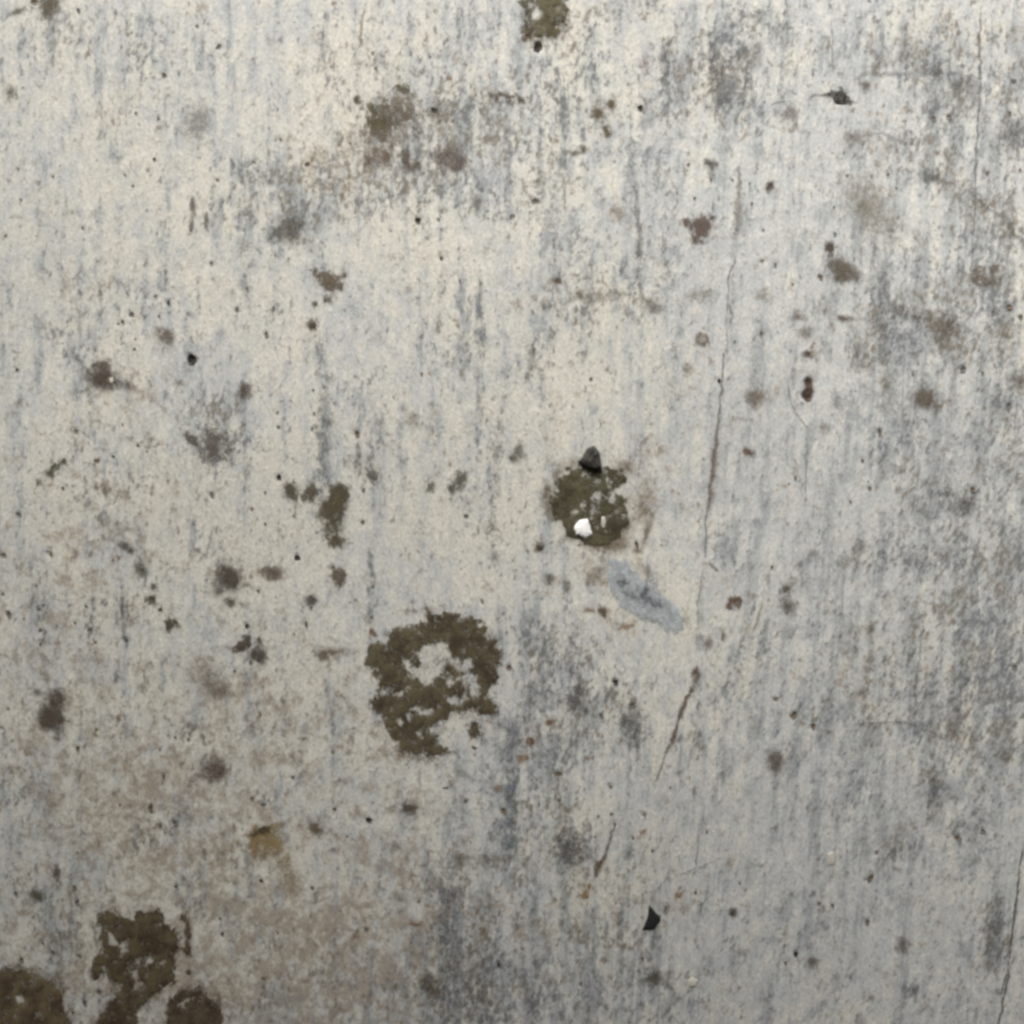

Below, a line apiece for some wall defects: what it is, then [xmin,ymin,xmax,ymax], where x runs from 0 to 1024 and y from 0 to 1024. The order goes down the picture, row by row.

damp [359,84,451,169]
damp [435,146,467,170]
damp [284,414,353,548]
damp [593,501,653,553]
crack [664,667,700,753]
crack [594,826,615,877]
crack [997,849,1024,1024]